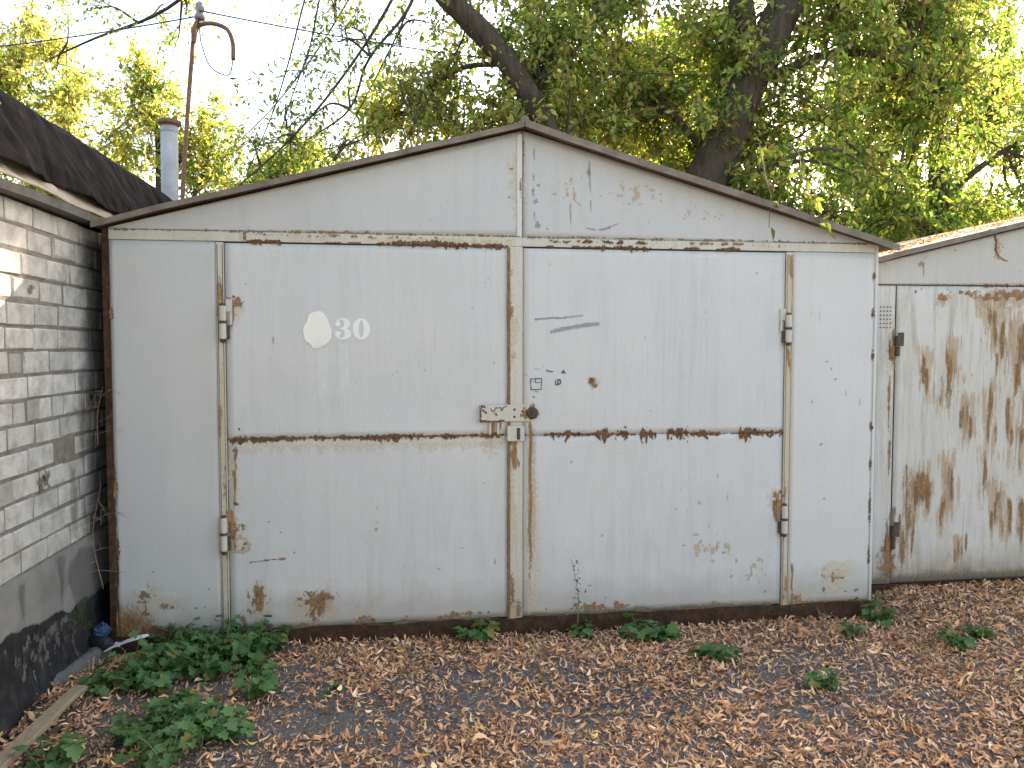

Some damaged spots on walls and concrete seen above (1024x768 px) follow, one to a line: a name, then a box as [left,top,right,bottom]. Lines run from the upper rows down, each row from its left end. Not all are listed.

corrosion [102,253,114,373]
corrosion [217,279,244,327]
corrosion [243,232,282,246]
corrosion [572,245,652,253]
corrosion [873,272,1024,484]
corrosion [105,412,172,637]
corrosion [219,403,783,619]
corrosion [867,465,954,578]
corrosion [990,493,1024,542]
corrosion [237,585,334,630]